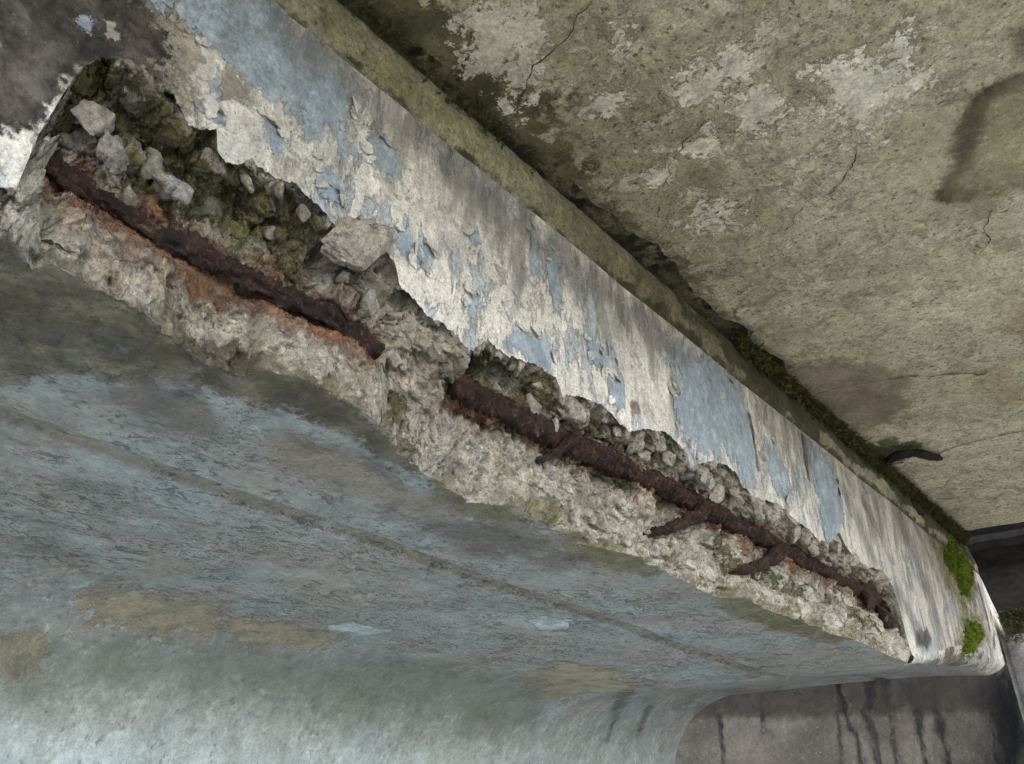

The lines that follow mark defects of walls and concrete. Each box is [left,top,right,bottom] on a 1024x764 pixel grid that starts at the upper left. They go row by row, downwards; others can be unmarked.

crack [517,5,589,119]
peeling [667,13,956,159]
crack [786,135,860,230]
leakage [937,74,1024,204]
rust [39,142,383,375]
spalling [0,0,912,668]
rust [440,383,690,516]
rust [694,507,878,614]
peeling [0,628,52,692]
leakage [692,511,1024,764]